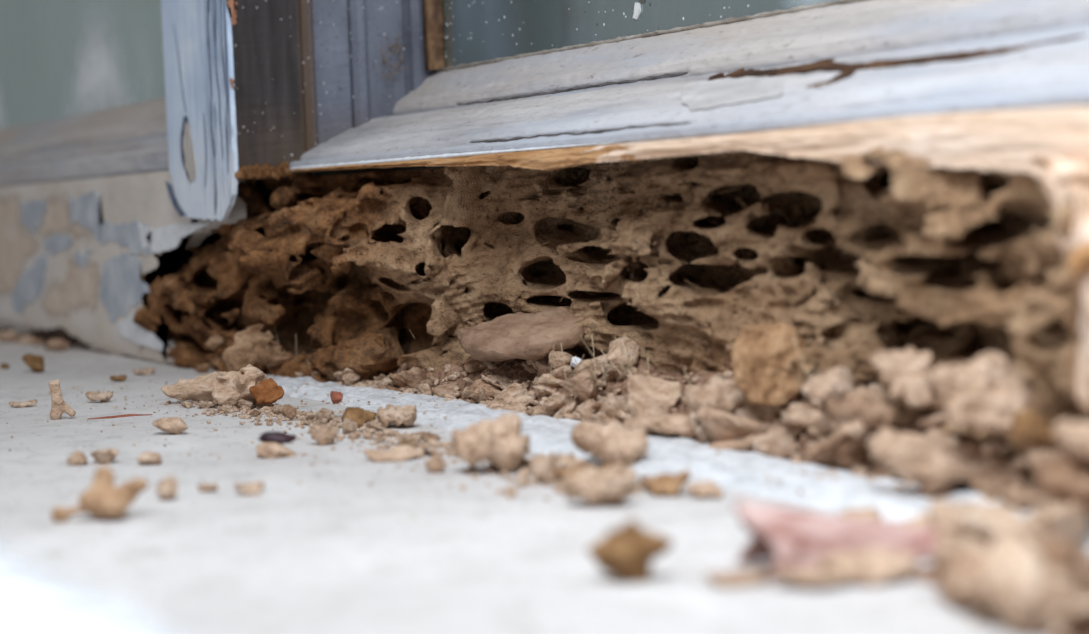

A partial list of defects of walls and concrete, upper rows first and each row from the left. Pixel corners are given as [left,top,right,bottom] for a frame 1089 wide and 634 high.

crack [458,34,1089,143]
peeling [0,191,212,351]